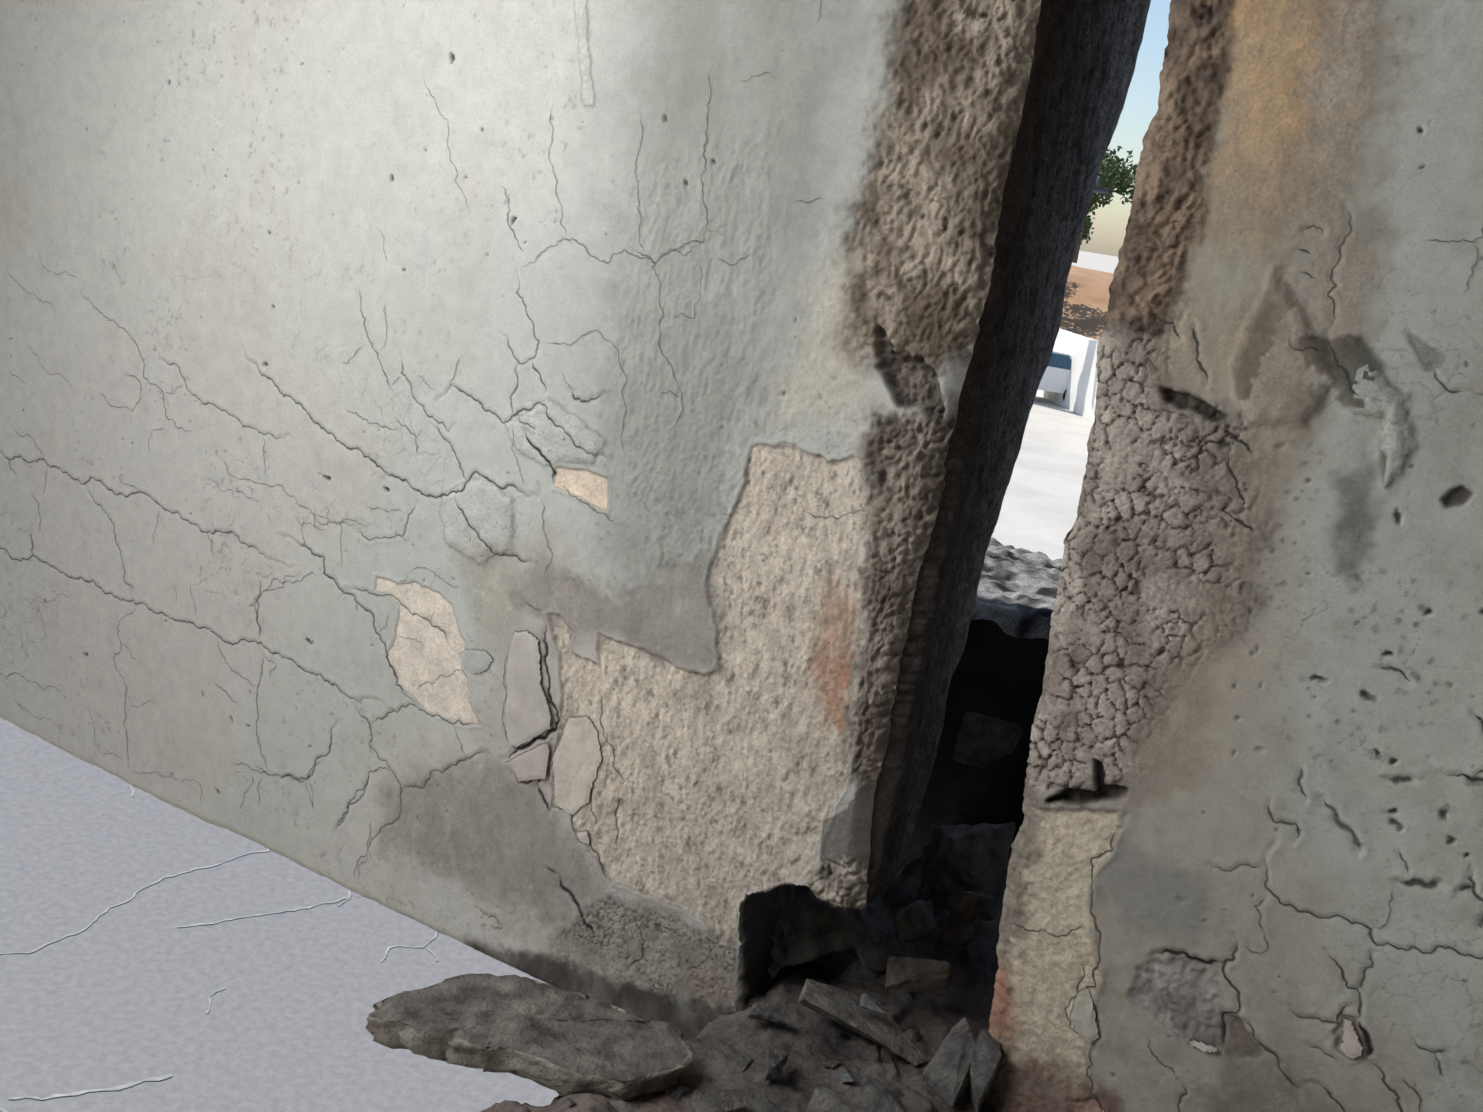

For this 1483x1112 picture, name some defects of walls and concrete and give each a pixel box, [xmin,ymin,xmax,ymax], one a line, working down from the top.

crack [0,272,736,1010]
crack [505,87,747,421]
peeling [375,0,1041,945]
spalling [983,0,1263,1112]
corrosion [1158,251,1202,373]
crack [1158,317,1208,379]
corrosion [1218,297,1252,371]
crack [1221,431,1252,530]
corrosion [1208,0,1324,254]
crack [1289,216,1357,395]
crack [1267,769,1360,847]
crack [1160,853,1483,1112]